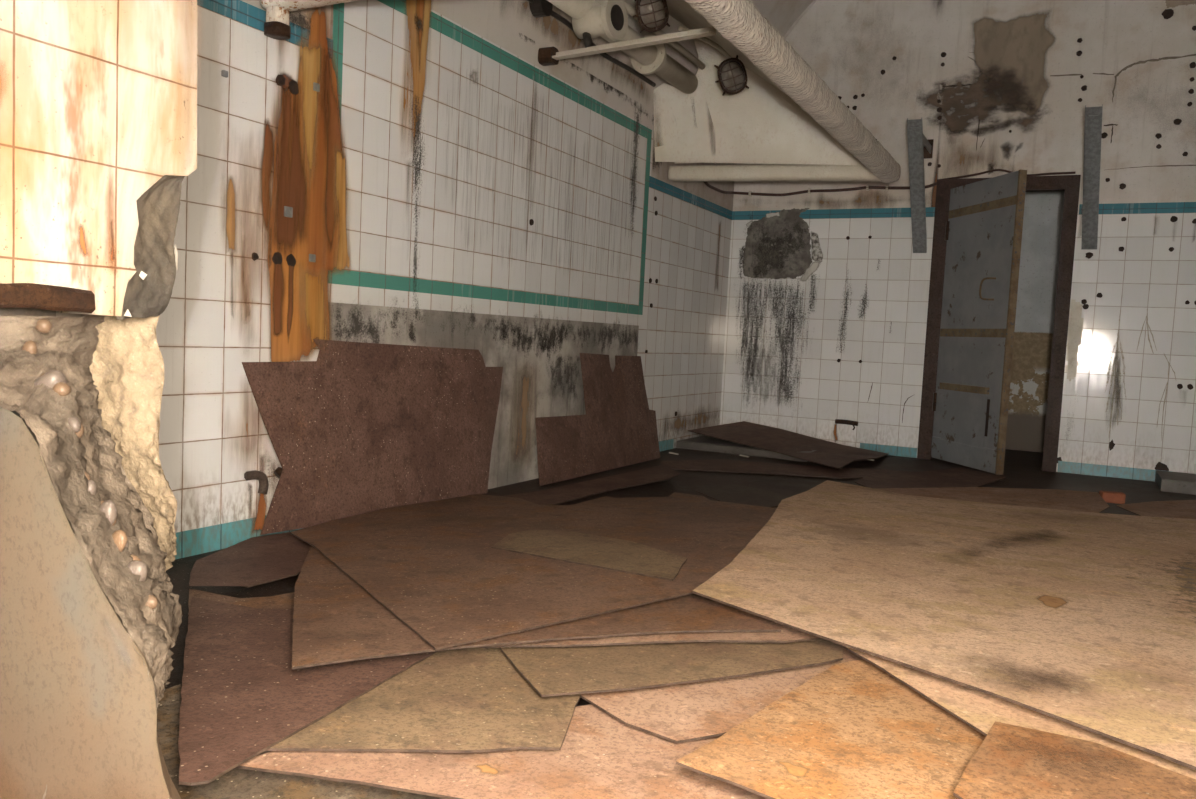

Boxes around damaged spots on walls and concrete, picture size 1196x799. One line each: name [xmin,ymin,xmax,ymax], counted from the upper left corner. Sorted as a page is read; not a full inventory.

peeling [1162,0,1196,19]
water stain [919,12,1055,173]
corrosion [226,179,252,319]
corrosion [242,0,503,535]
water stain [335,97,424,343]
corrosion [931,155,939,207]
spalling [0,175,185,709]
water stain [468,314,637,399]
corrosion [535,353,660,486]
corrosion [178,421,1196,799]